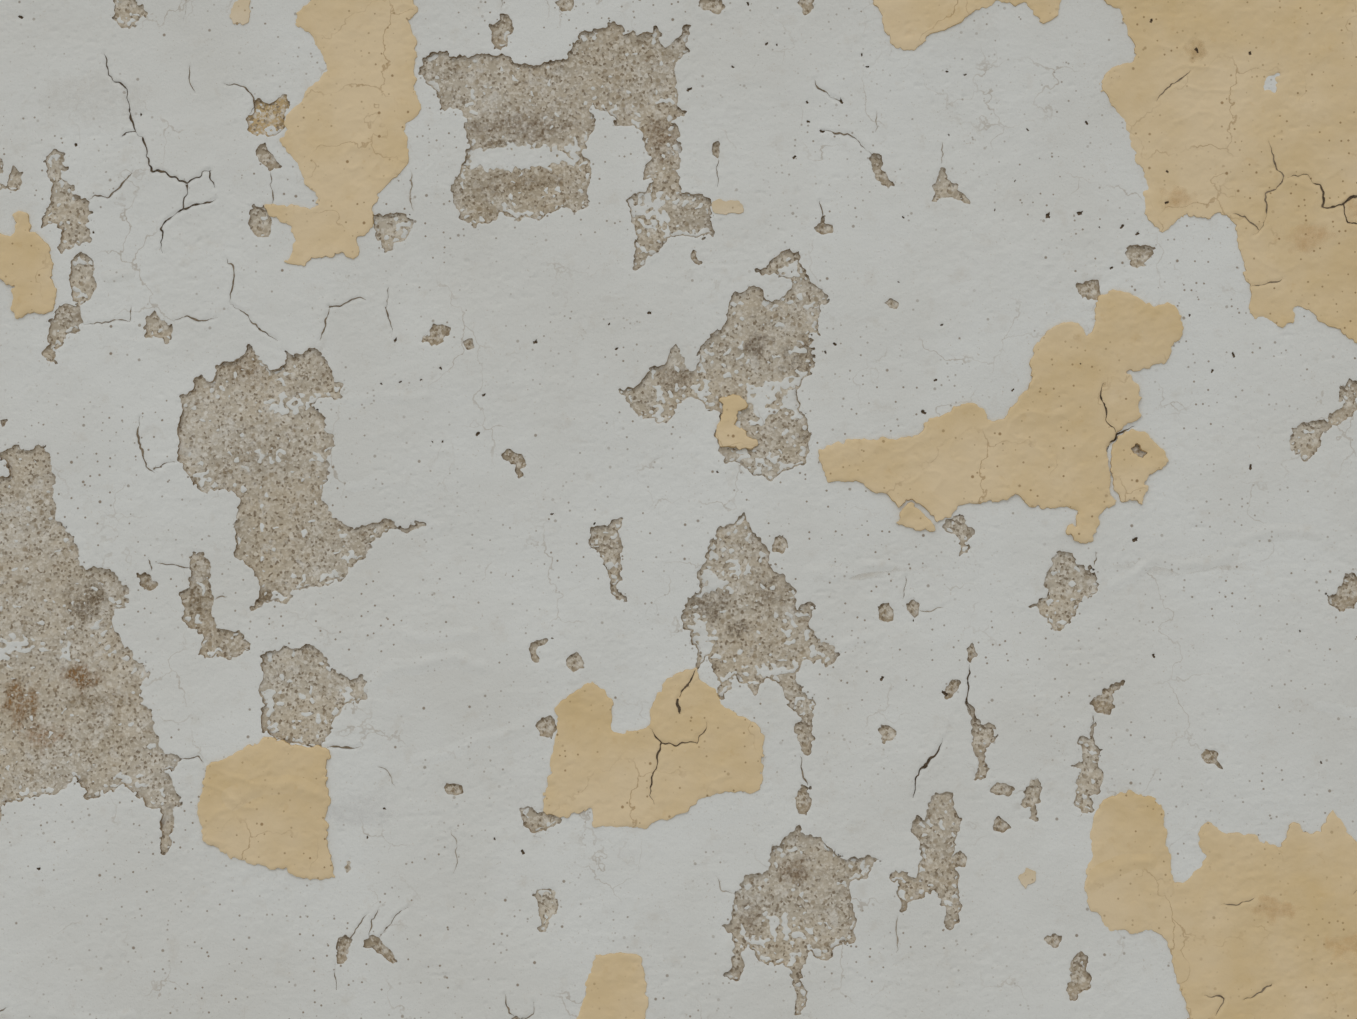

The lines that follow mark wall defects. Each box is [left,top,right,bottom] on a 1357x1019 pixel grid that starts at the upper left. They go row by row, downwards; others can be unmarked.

crack [89,56,215,253]
crack [189,67,255,112]
spalling [246,0,744,271]
peeling [1099,0,1357,343]
crack [1235,146,1357,235]
spalling [178,345,426,611]
peeling [619,250,1191,631]
spalling [1289,379,1357,462]
spalling [0,445,367,880]
crack [650,671,707,800]
peeling [520,513,840,833]
spalling [722,785,967,1015]